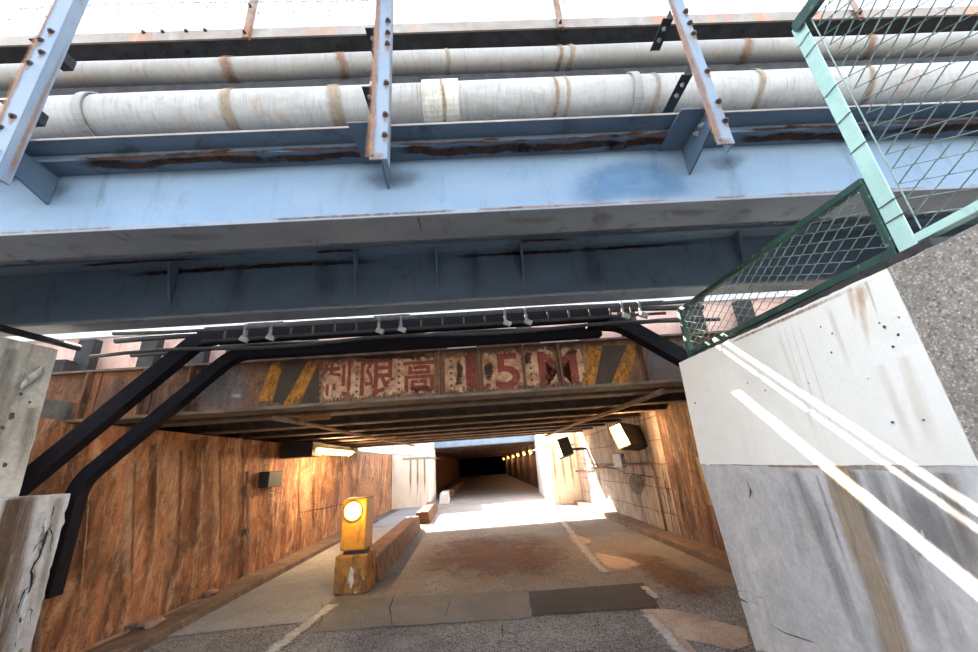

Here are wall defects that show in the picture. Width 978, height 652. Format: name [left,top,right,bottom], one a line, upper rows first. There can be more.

rust [0,11,52,122]
rust [13,91,46,165]
rust [84,0,392,170]
rust [405,131,668,157]
rust [669,0,729,143]
rust [736,38,766,110]
rust [742,125,844,142]
crack [15,507,54,647]